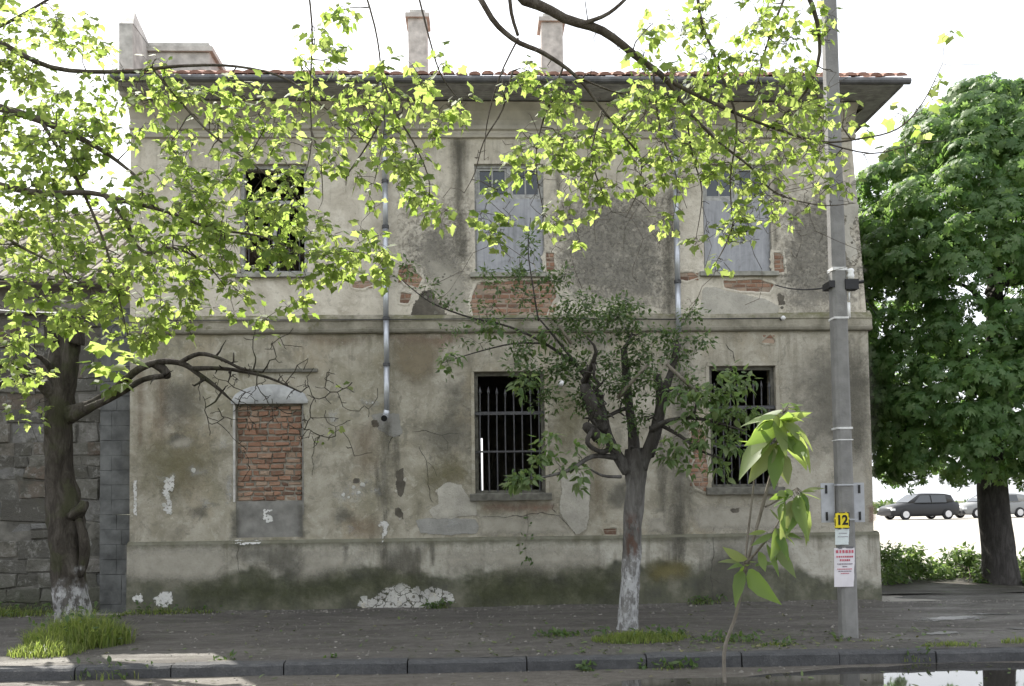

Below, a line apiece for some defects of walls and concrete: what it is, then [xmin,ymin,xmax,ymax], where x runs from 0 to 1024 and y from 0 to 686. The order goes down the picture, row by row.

water stain [453,141,465,257]
flaking render [777,200,829,309]
peeling [162,474,175,515]
flaking render [378,468,407,542]
crack [483,503,576,535]